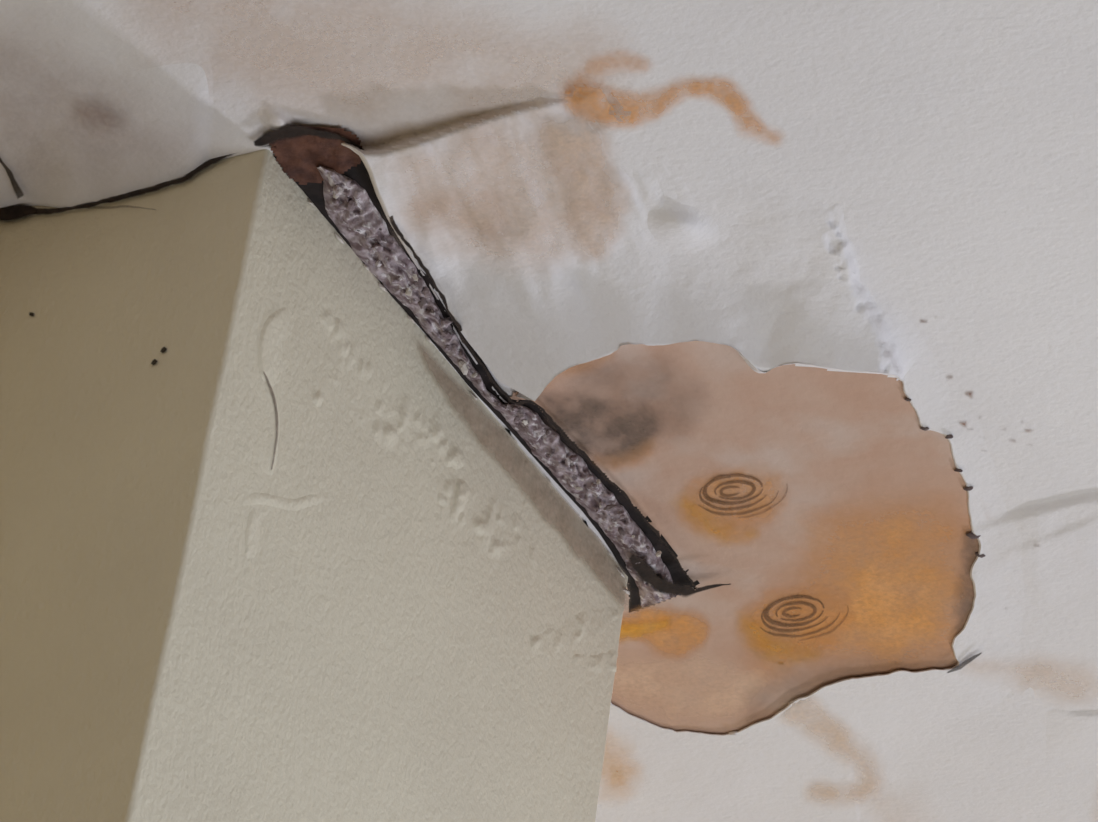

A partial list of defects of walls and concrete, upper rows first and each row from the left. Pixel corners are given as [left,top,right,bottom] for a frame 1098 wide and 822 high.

crack [0,125,731,613]
water stain [605,417,653,456]
corrosion [620,609,707,654]
peeling [429,233,1031,822]
corrosion [794,514,963,661]